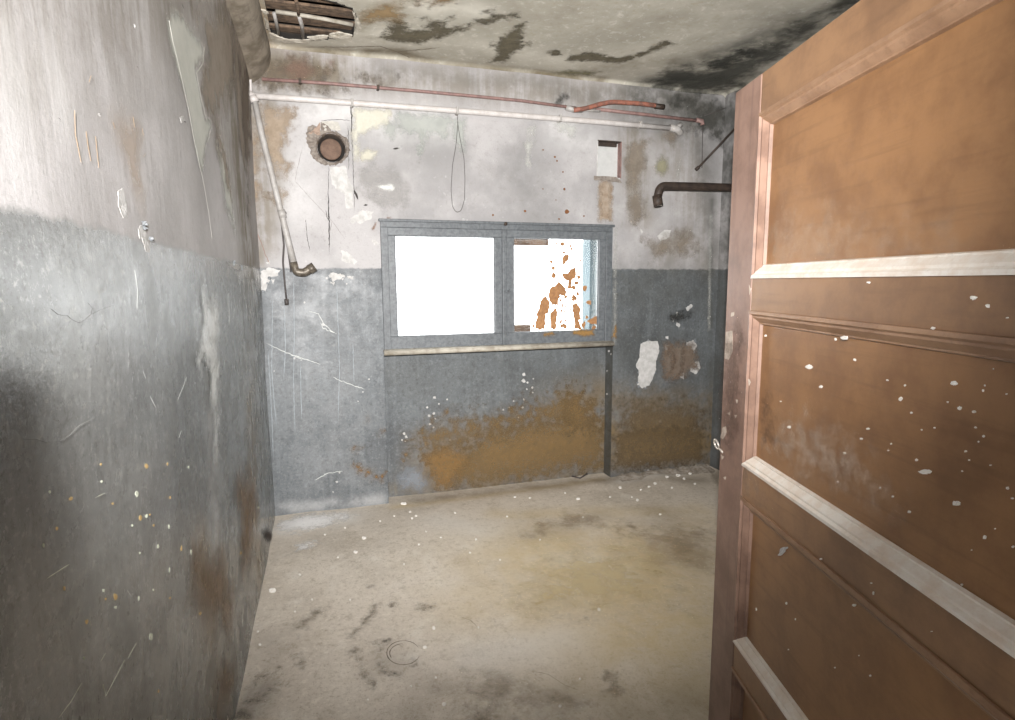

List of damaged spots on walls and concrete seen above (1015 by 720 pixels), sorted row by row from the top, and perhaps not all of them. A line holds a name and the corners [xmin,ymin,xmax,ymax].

damp [362,5,524,62]
damp [551,41,672,76]
flaking render [306,121,374,224]
damp [624,141,646,225]
peeling [636,336,670,389]
peeling [680,339,701,379]